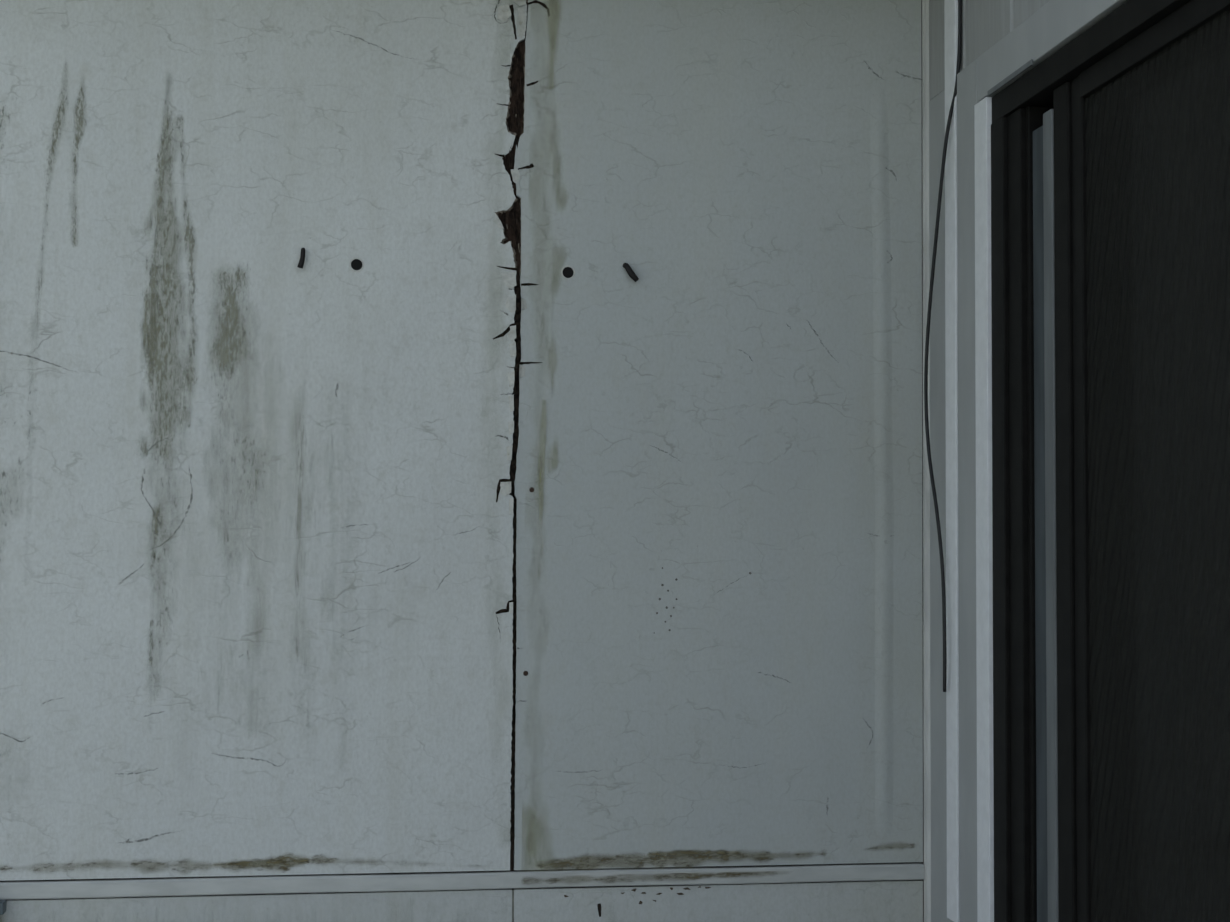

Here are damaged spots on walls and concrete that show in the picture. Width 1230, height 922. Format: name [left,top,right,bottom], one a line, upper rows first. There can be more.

peeling [494,0,550,39]
water stain [47,87,84,174]
crack [495,145,534,195]
water stain [142,115,195,458]
water stain [213,269,247,375]
crack [493,266,542,849]
water stain [221,859,308,868]